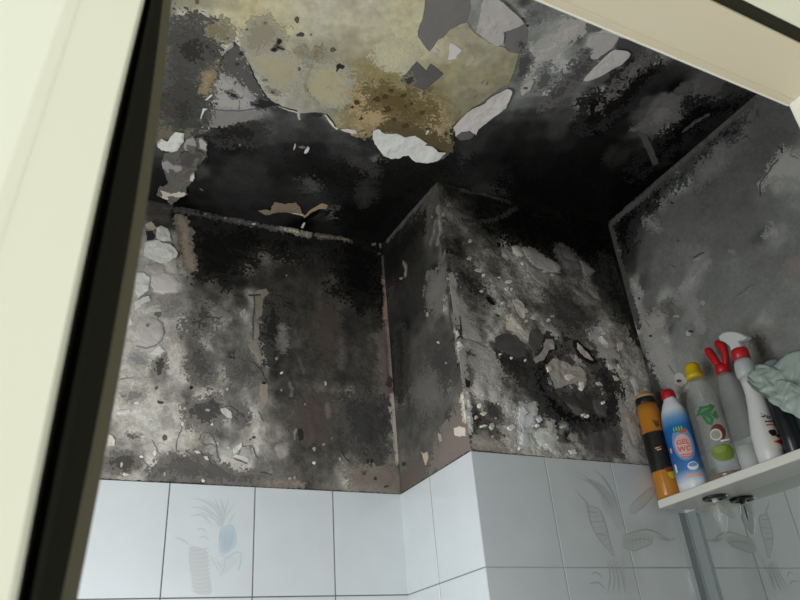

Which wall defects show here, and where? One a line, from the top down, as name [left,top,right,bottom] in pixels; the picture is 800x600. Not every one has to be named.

leakage [156,0,424,146]
peeling [168,0,534,163]
leakage [511,23,602,104]
peeling [583,33,639,82]
leakage [577,48,661,132]
peeling [156,124,208,205]
leakage [757,143,800,192]
peeling [144,213,199,274]
peeling [259,202,328,228]
leakage [161,75,758,466]
peeling [486,296,603,391]
leakage [102,293,271,487]